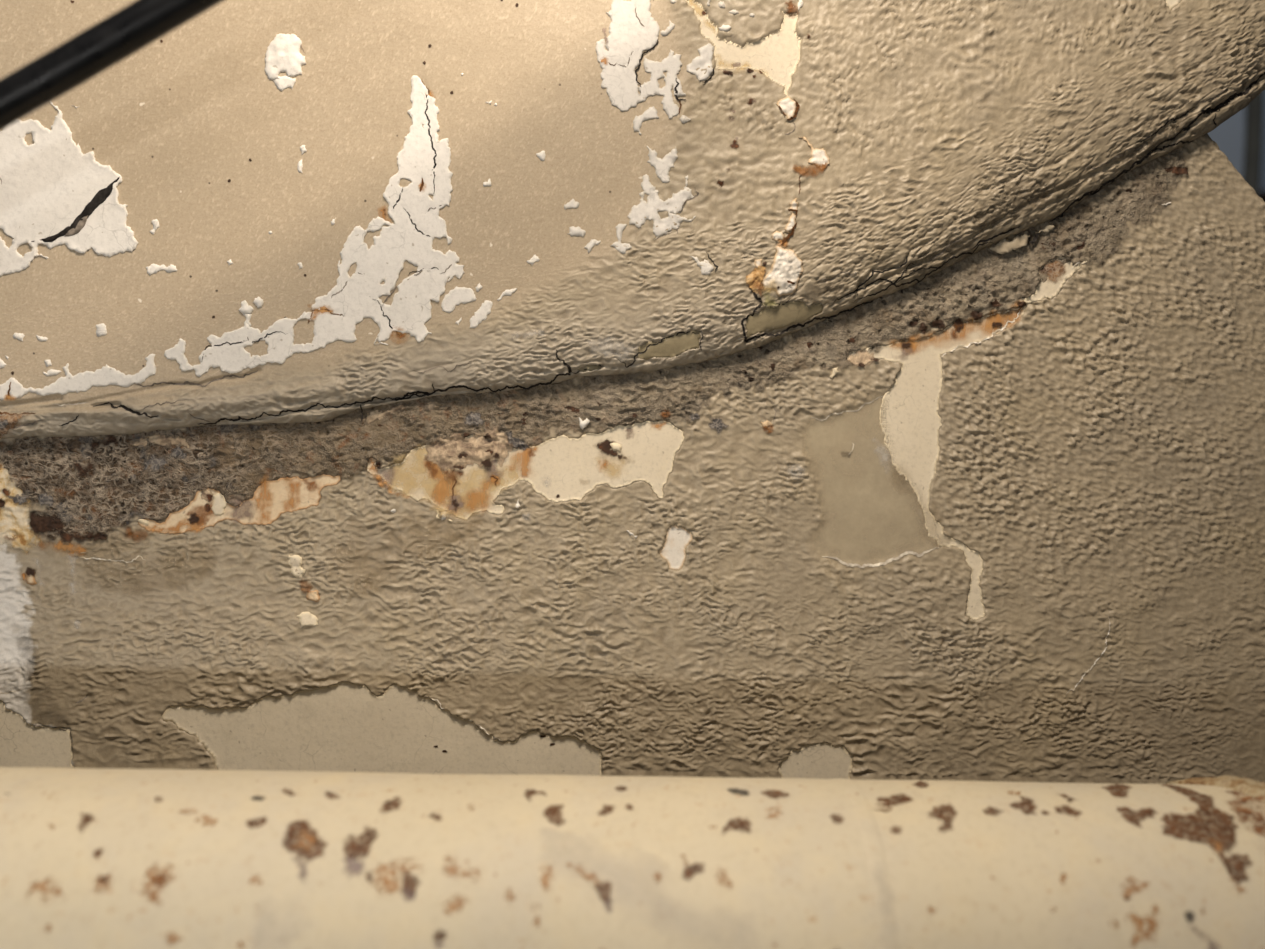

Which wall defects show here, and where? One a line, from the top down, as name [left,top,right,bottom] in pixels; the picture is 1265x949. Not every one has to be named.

crack [31,177,120,242]
peeling [0,44,517,400]
crack [393,80,442,236]
crack [619,0,659,93]
peeling [568,0,714,254]
crack [741,72,1265,342]
peeling [138,474,341,534]
crack [0,264,703,429]
peeling [367,421,684,522]
corrosion [0,147,1188,585]
peeling [659,525,693,570]
peeling [830,257,1087,621]